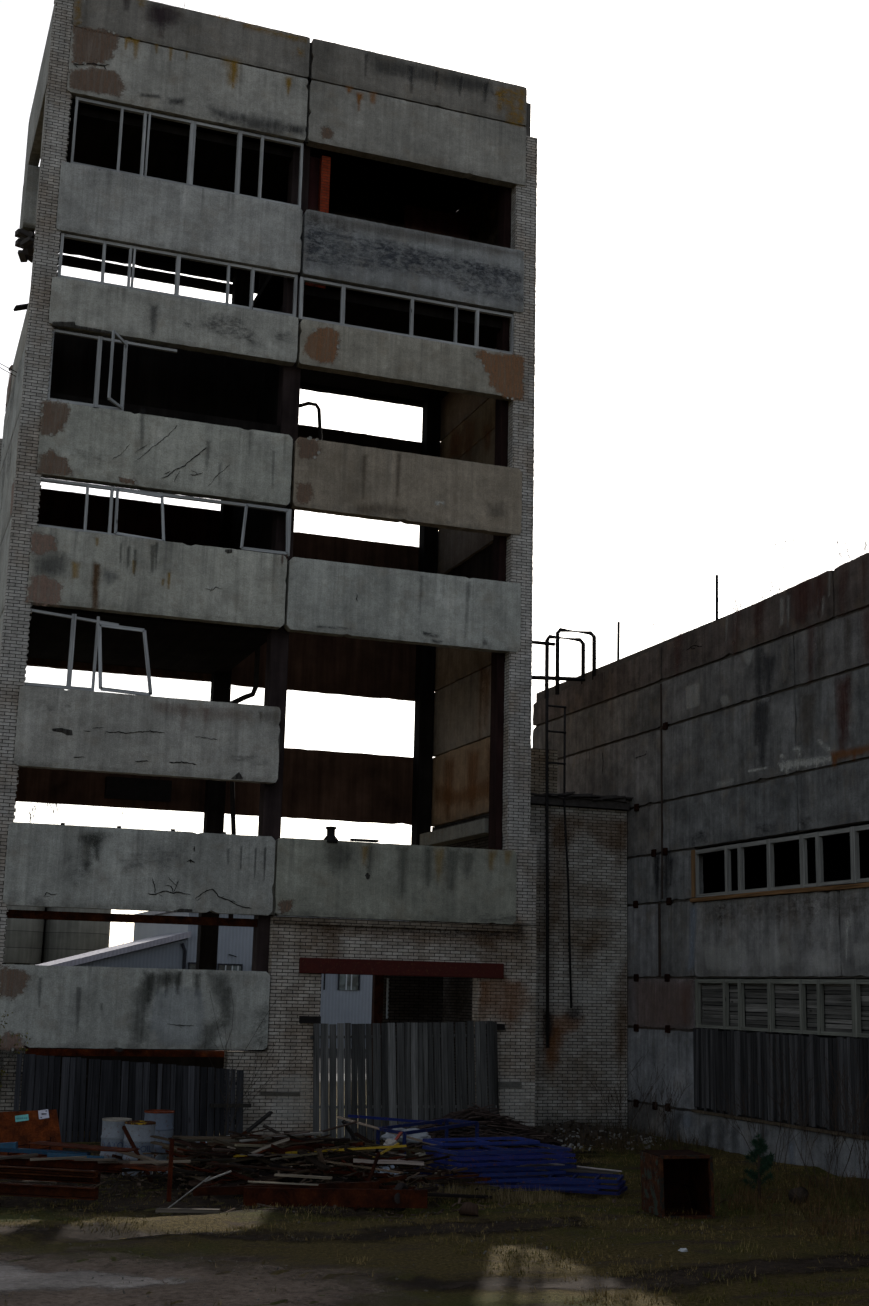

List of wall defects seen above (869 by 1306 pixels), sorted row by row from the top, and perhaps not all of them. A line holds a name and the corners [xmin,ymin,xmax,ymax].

peeling [69,26,125,98]
water stain [306,229,522,300]
peeling [303,327,341,364]
peeling [474,350,526,400]
peeling [37,400,72,476]
crack [113,426,228,486]
peeling [29,528,58,555]
peeling [26,575,63,606]
crack [148,846,250,908]
peeling [0,965,31,1001]